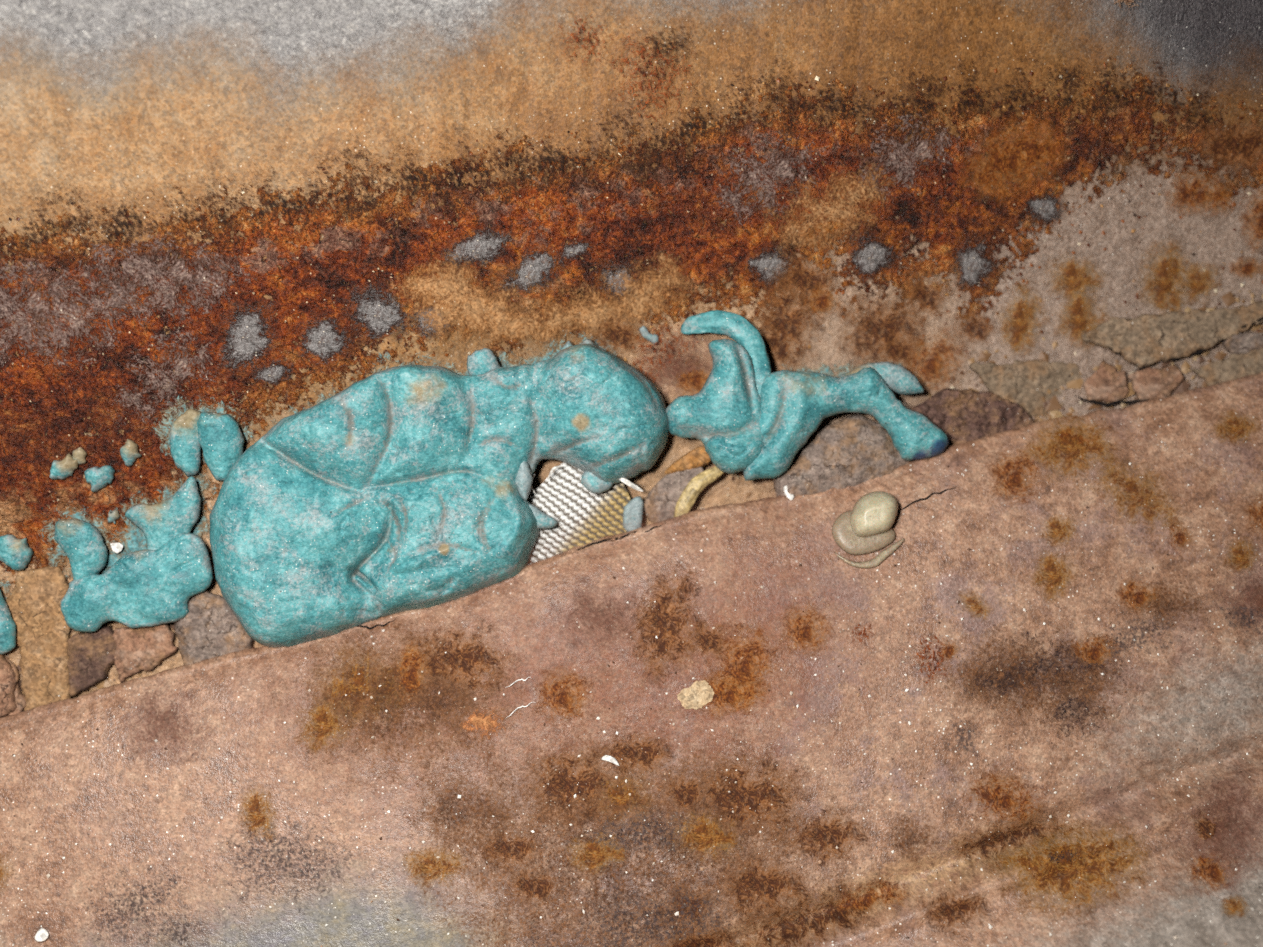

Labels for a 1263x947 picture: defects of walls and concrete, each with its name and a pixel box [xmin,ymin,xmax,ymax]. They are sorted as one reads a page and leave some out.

water stain [229,277,634,440]
water stain [0,0,1263,283]
corrosion [0,16,1263,598]
spalling [948,237,994,290]
spalling [1025,189,1062,224]
peeling [969,301,1263,420]
crack [1075,317,1263,407]
peeling [5,566,179,715]
corrosion [566,572,832,720]
corrosion [917,580,1204,738]
corrosion [279,618,908,947]
corrosion [892,774,1143,915]